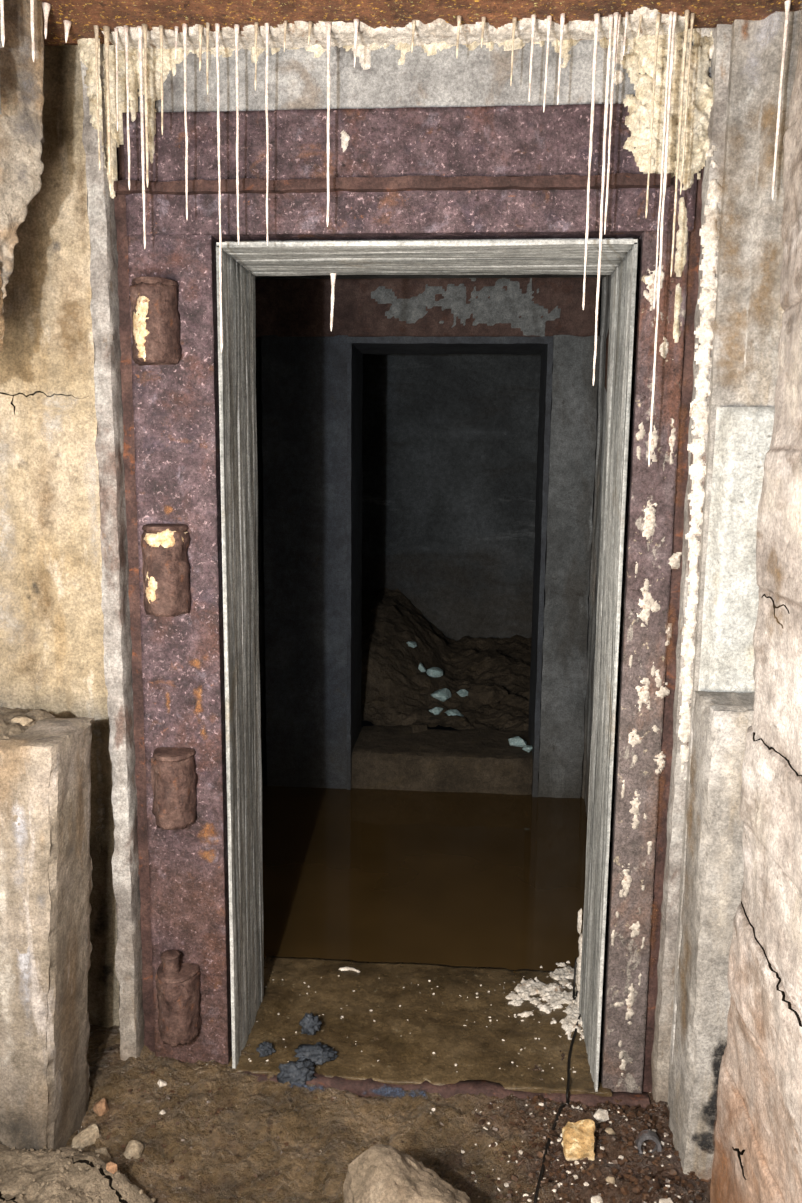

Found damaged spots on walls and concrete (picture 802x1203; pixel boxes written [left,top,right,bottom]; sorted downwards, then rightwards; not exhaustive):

damp [763,109,777,131]
damp [60,302,81,354]
peeling [371,278,561,337]
damp [78,7,745,781]
crack [753,732,802,777]
damp [504,908,584,1040]
crack [741,902,802,1027]
damp [692,1042,727,1153]